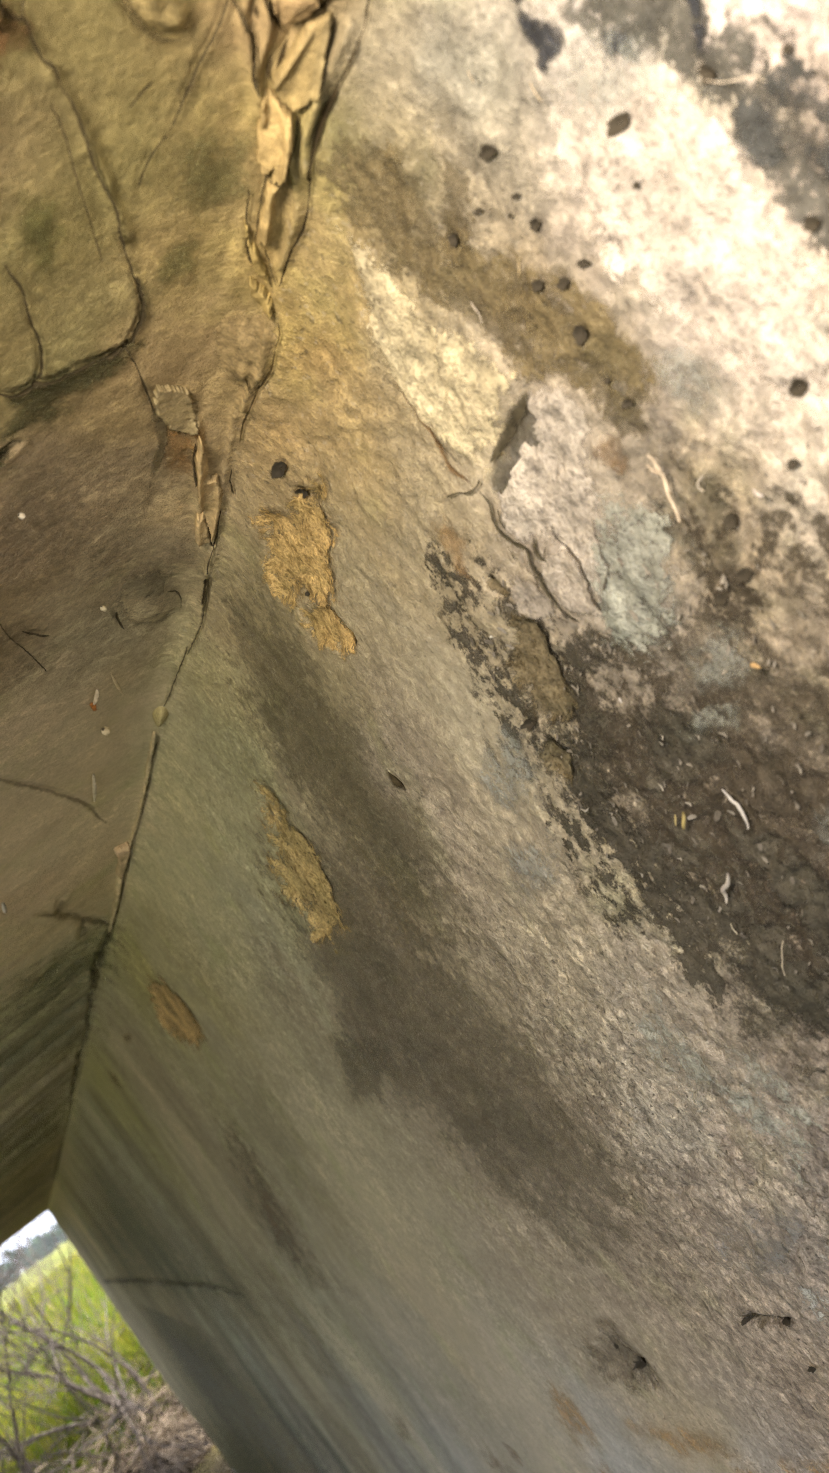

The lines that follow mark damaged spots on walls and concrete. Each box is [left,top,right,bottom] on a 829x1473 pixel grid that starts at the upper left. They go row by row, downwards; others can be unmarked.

crack [0,0,370,707]
spalling [270,461,287,479]
flaking render [244,0,333,320]
spalling [248,472,356,656]
water stain [499,284,557,340]
water stain [553,48,829,423]
crack [55,744,157,1180]
spalling [147,977,207,1051]
spalling [250,780,350,954]
water stain [230,596,636,1261]
water stain [425,545,829,1057]
water stain [639,1019,822,1179]